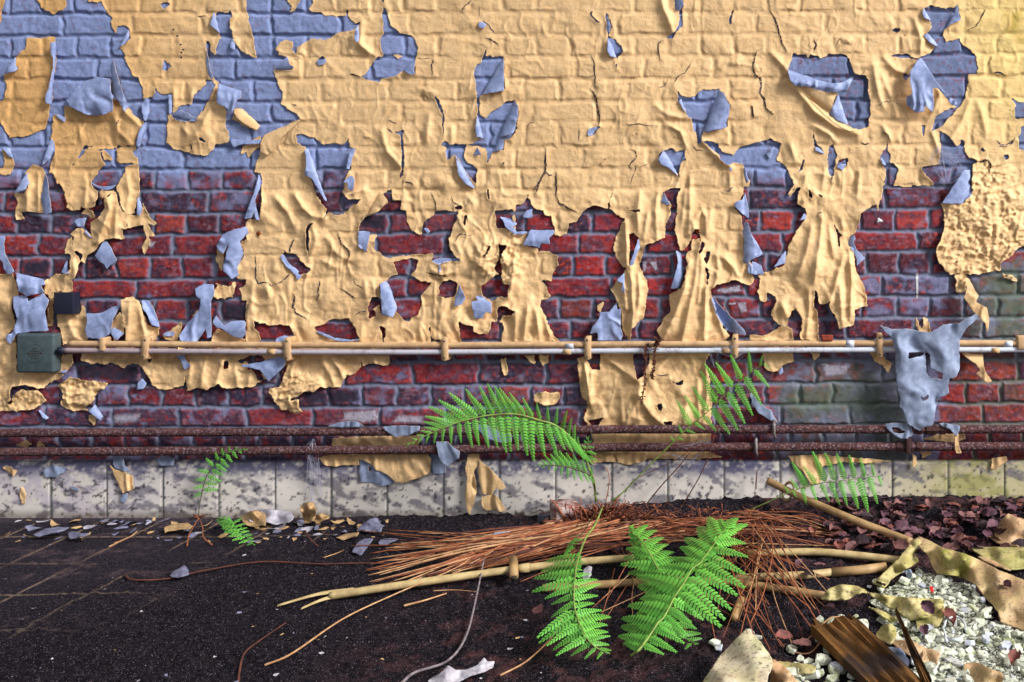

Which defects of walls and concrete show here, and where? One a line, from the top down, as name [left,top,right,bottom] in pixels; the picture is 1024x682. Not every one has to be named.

crack [751,11,786,116]
peeling [0,0,1024,461]
crack [535,147,577,213]